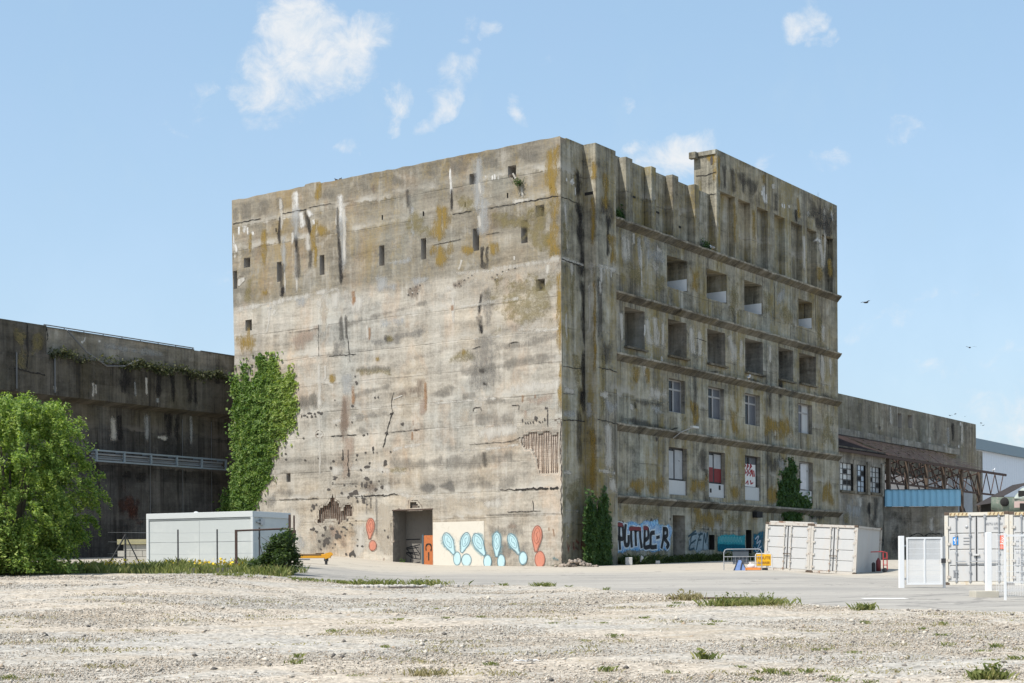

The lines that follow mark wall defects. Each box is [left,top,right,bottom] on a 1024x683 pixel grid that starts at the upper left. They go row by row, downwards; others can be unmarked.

leakage [239,192,369,336]
leakage [458,170,667,466]
spalling [310,447,391,557]
crack [383,393,420,447]
spalling [519,407,562,476]
crack [500,393,618,561]
leakage [599,424,616,491]